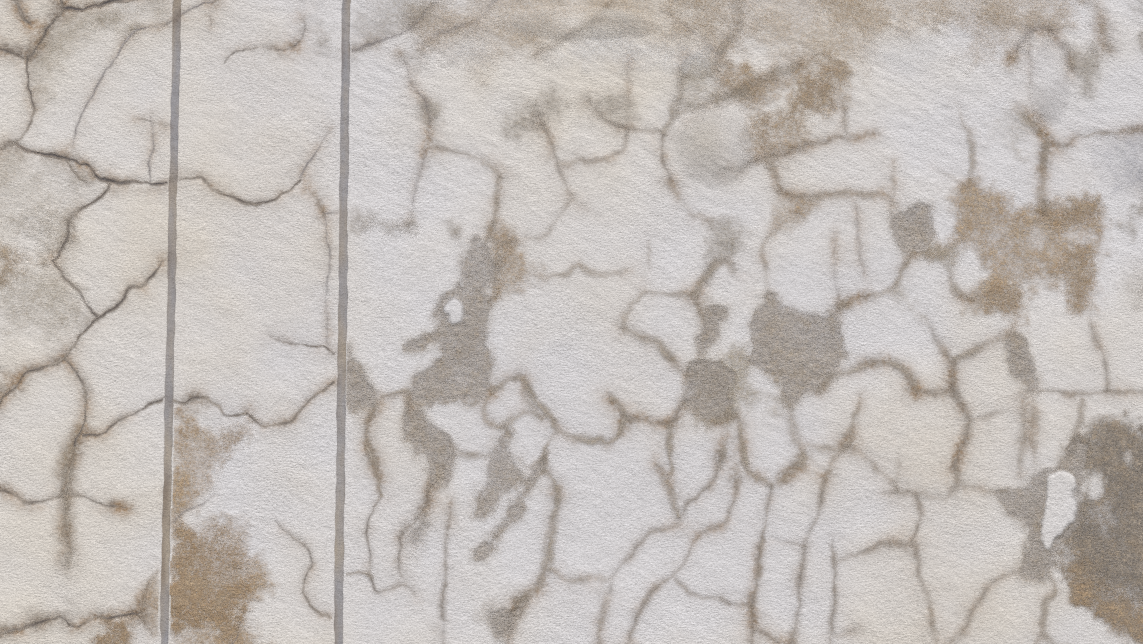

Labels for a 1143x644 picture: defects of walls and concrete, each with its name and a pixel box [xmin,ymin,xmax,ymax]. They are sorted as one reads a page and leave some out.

water stain [721,0,883,151]
crack [0,0,334,560]
peeling [403,237,499,486]
peeling [685,306,735,420]
peeling [750,293,848,403]
water stain [925,179,1102,313]
crack [0,591,145,634]
water stain [169,523,272,644]
crack [303,548,332,619]
crack [346,411,398,593]
crack [486,377,859,643]
water stain [1059,413,1143,643]